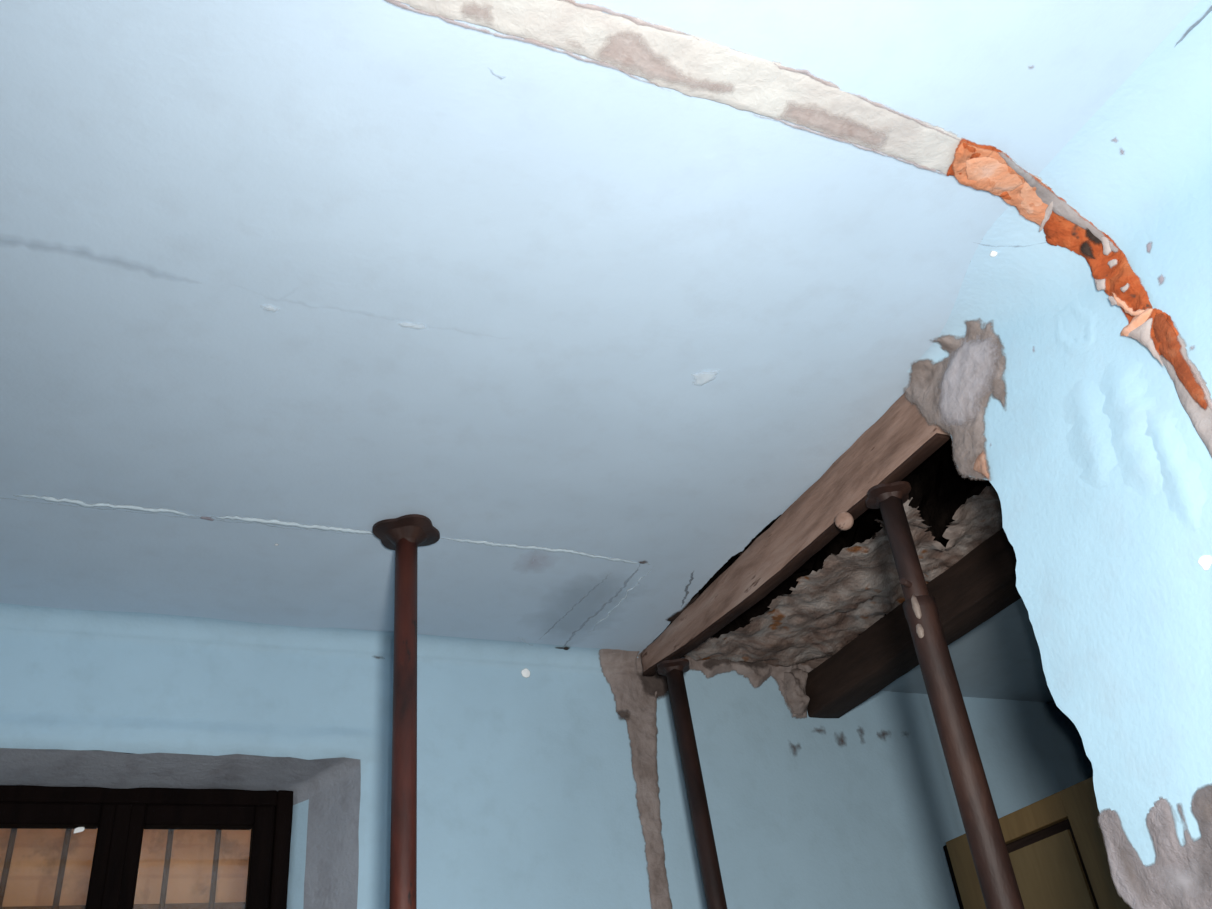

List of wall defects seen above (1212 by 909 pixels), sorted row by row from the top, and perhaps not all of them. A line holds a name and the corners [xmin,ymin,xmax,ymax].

spalling [386,0,635,78]
spalling [563,0,684,34]
damp [601,35,732,91]
crack [1176,6,1212,45]
damp [784,106,885,146]
crack [16,495,373,534]
spalling [901,435,992,547]
crack [440,538,650,565]
spalling [661,514,782,634]
spalling [711,508,883,638]
peeling [911,595,924,638]
flaking render [1099,785,1212,909]